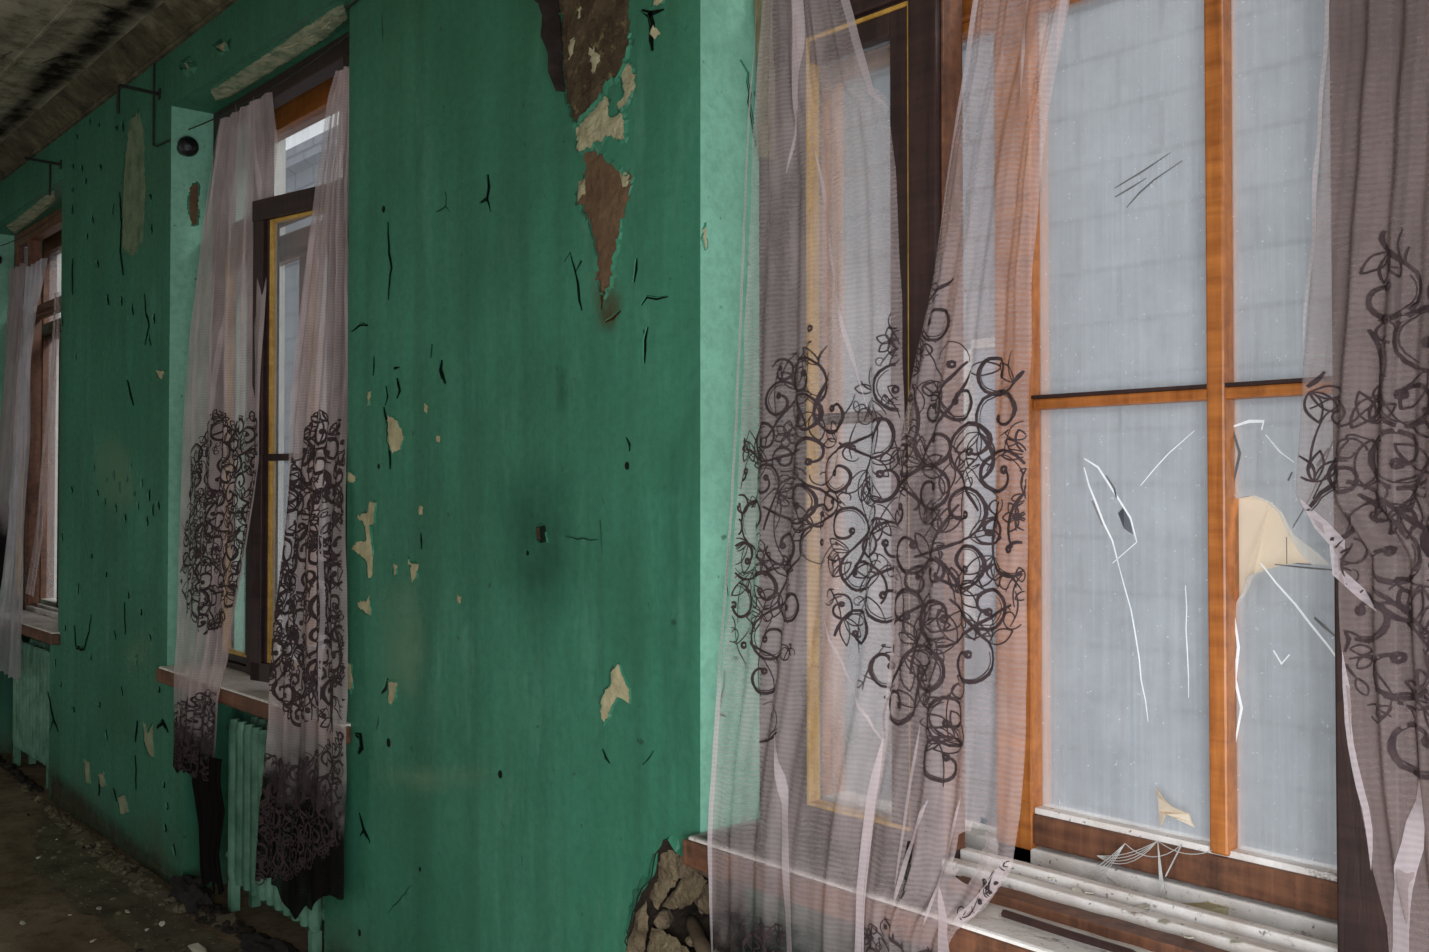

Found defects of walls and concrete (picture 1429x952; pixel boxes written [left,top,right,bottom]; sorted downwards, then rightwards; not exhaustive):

water stain [0,0,150,135]
flaking render [534,0,636,301]
peeling [386,415,405,454]
peeling [351,501,377,579]
peeling [357,597,373,616]
peeling [393,557,419,584]
peeling [599,663,632,727]
spalling [624,834,737,952]